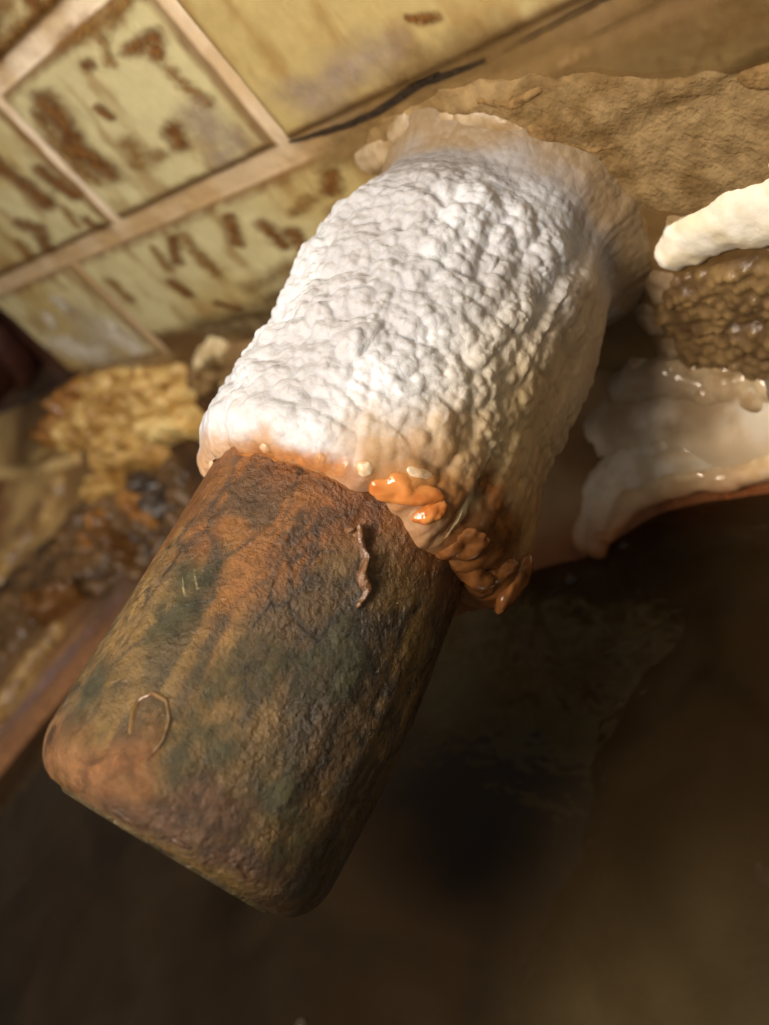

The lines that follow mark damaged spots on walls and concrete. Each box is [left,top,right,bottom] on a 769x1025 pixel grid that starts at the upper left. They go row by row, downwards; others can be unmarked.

damp [0,0,769,725]
corrosion [237,447,348,478]
corrosion [363,460,533,615]